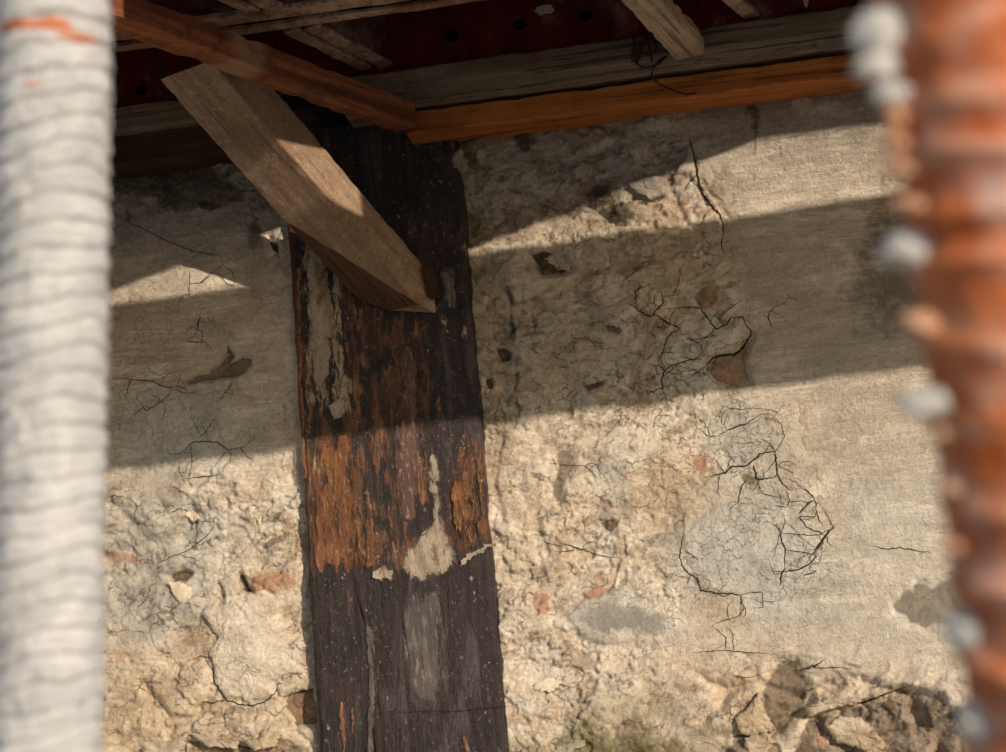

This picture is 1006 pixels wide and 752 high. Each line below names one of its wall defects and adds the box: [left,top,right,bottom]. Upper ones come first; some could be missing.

crack [684,138,724,253]
crack [112,212,235,346]
peeling [306,248,335,392]
crack [629,270,800,394]
crack [112,364,258,479]
peeling [328,397,345,420]
peeling [372,342,496,581]
crack [671,406,834,678]
spalling [728,661,966,752]